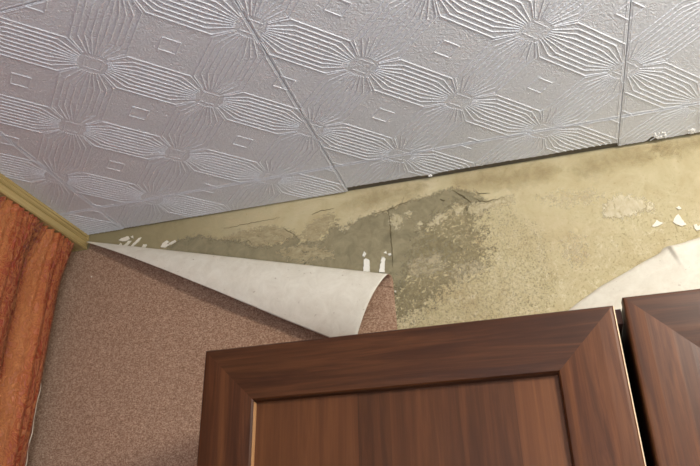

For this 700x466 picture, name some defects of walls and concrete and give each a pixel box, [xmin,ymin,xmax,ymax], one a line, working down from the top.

spalling [602,193,655,220]
peeling [673,206,700,231]
peeling [119,236,147,248]
spalling [223,214,351,264]
leakage [167,187,496,326]